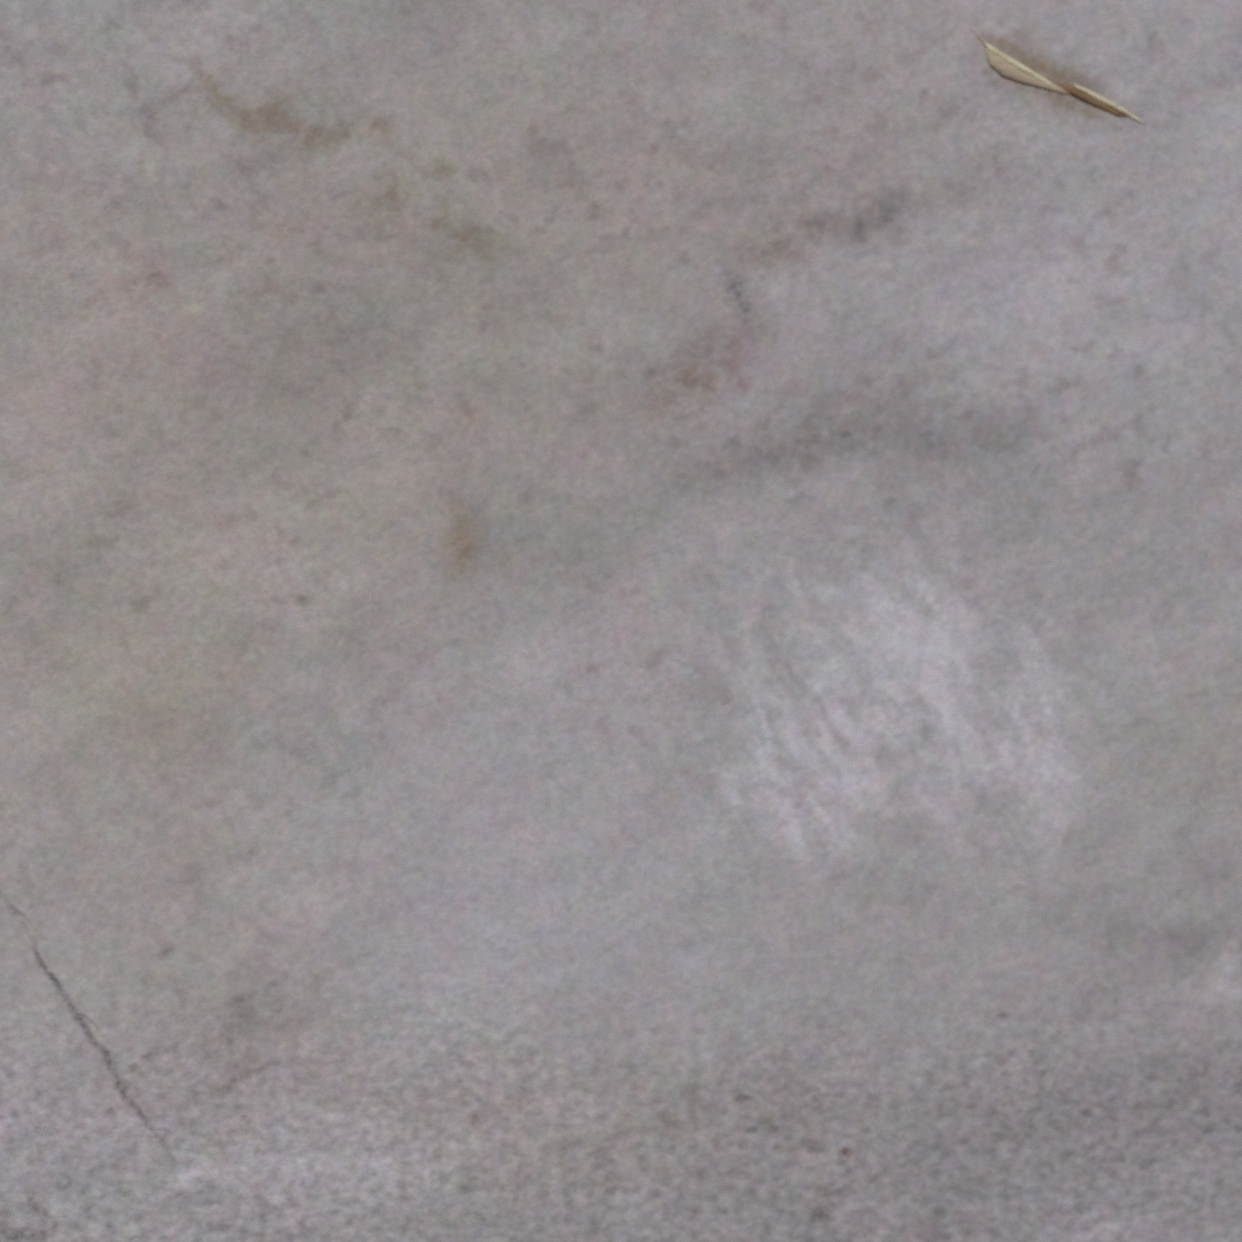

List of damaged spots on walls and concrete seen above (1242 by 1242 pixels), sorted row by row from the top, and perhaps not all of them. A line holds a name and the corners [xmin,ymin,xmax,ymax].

crack [0,887,178,1161]